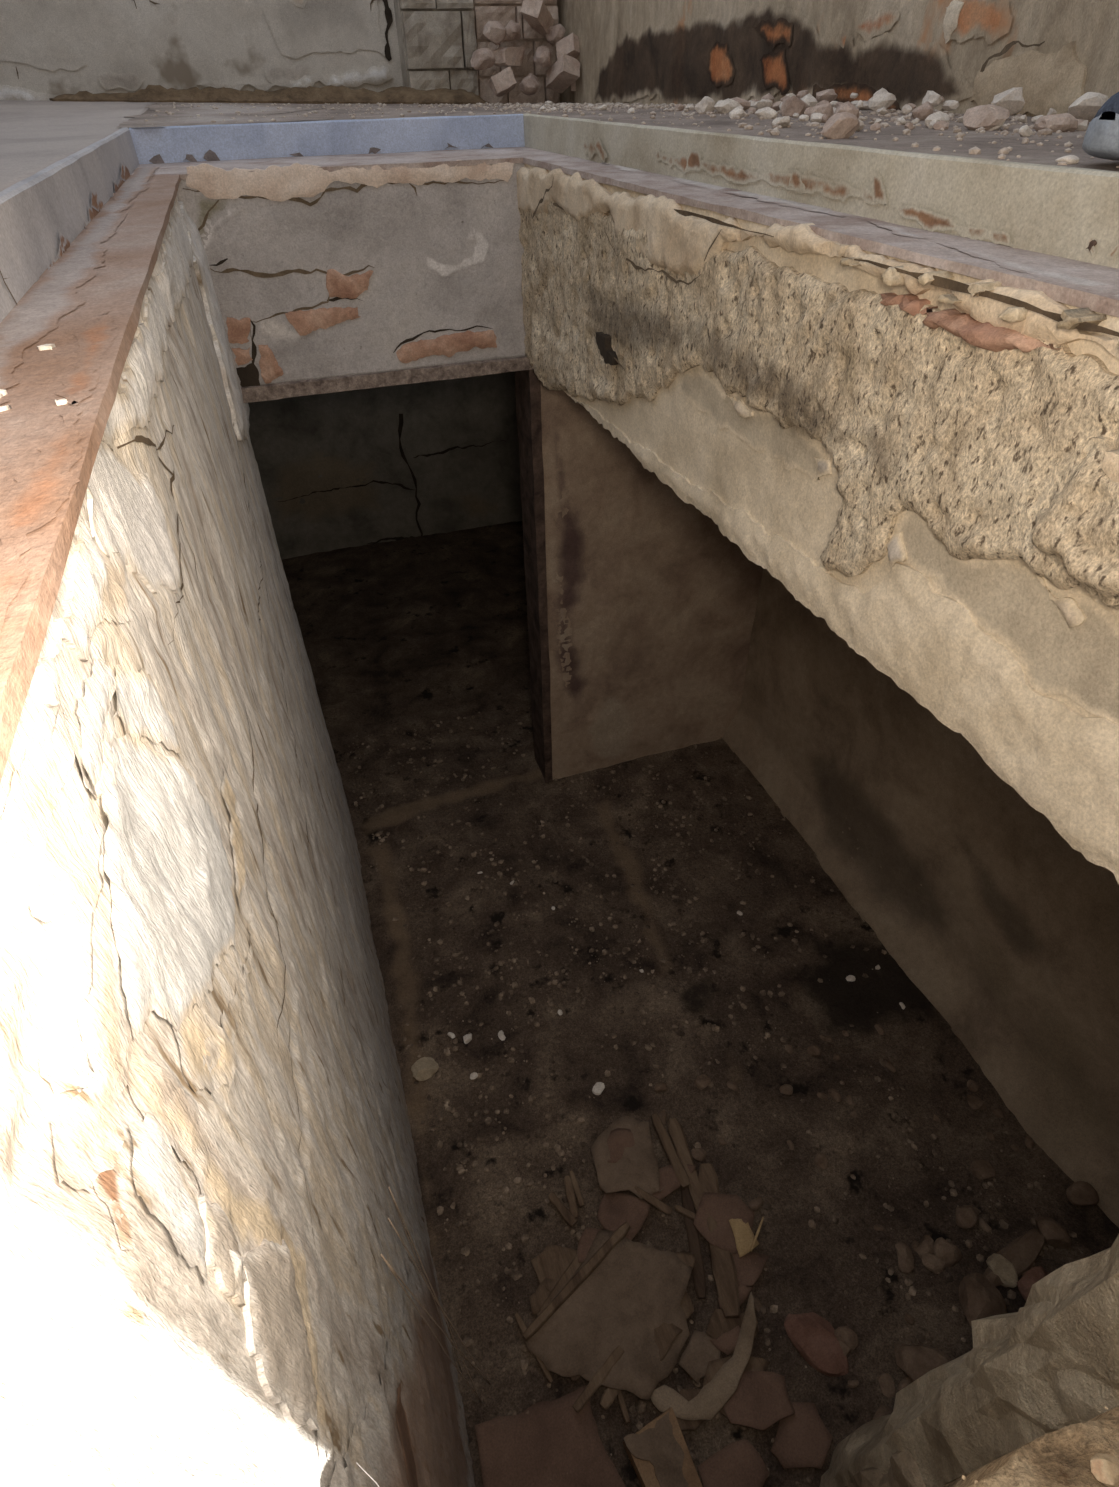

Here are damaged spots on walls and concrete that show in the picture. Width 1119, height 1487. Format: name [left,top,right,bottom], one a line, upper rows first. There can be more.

crack [370,0,393,61]
rust [48,161,130,270]
rust [0,309,118,637]
leakage [545,413,639,765]
spalling [177,160,1119,884]
crack [233,414,506,1275]